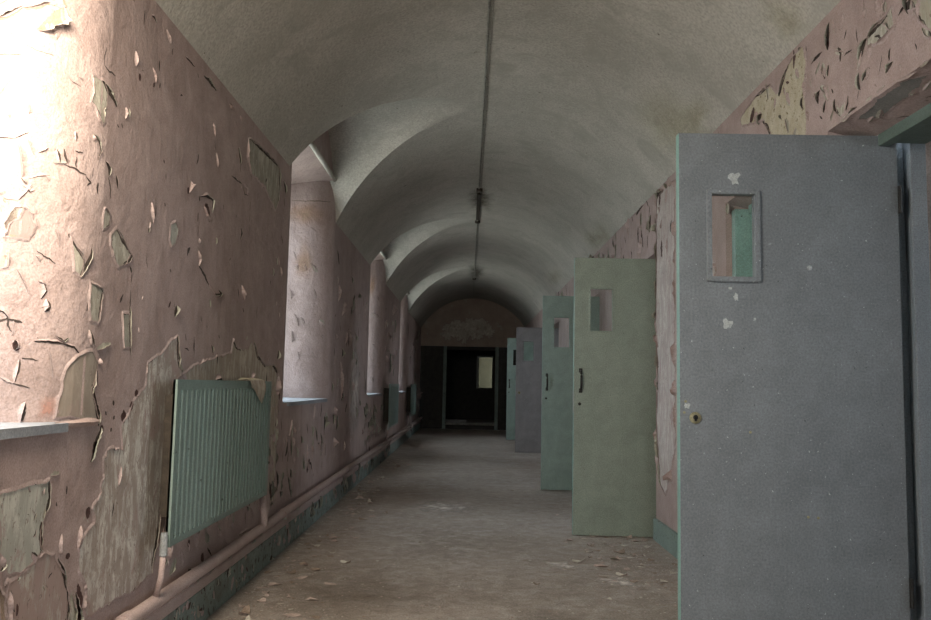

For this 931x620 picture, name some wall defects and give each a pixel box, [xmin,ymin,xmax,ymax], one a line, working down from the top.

peeling [0,0,72,40]
peeling [90,73,131,175]
peeling [740,0,931,135]
peeling [101,206,133,270]
peeling [589,176,690,496]
spalling [0,233,390,620]